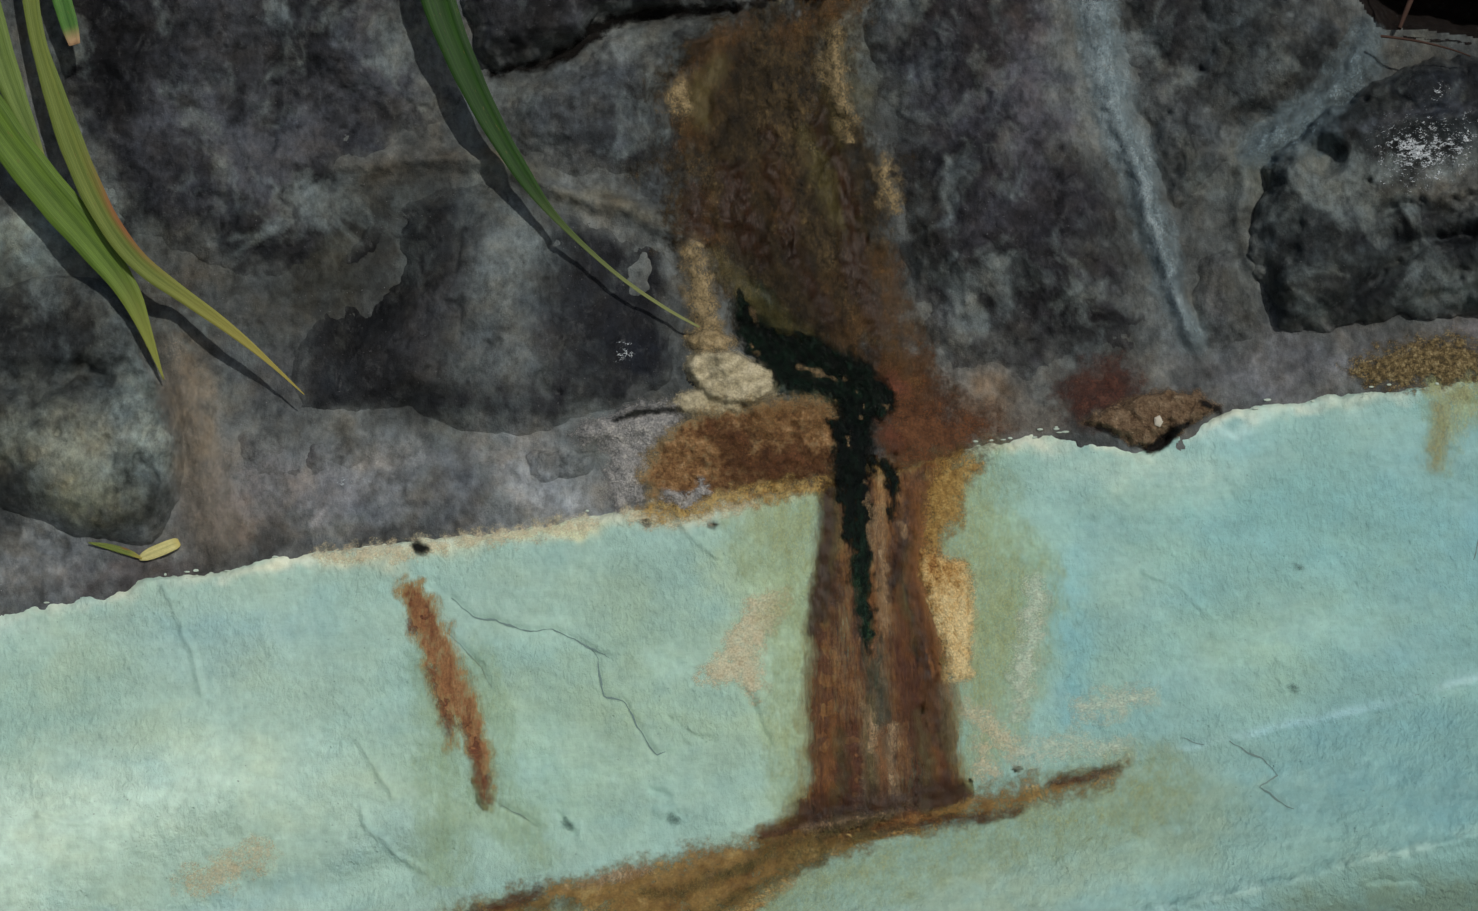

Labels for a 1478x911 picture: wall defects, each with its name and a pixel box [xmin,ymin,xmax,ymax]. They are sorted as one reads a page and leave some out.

corrosion [393,576,497,803]
damp [570,0,956,513]
corrosion [635,354,1040,833]
spalling [1032,387,1222,453]